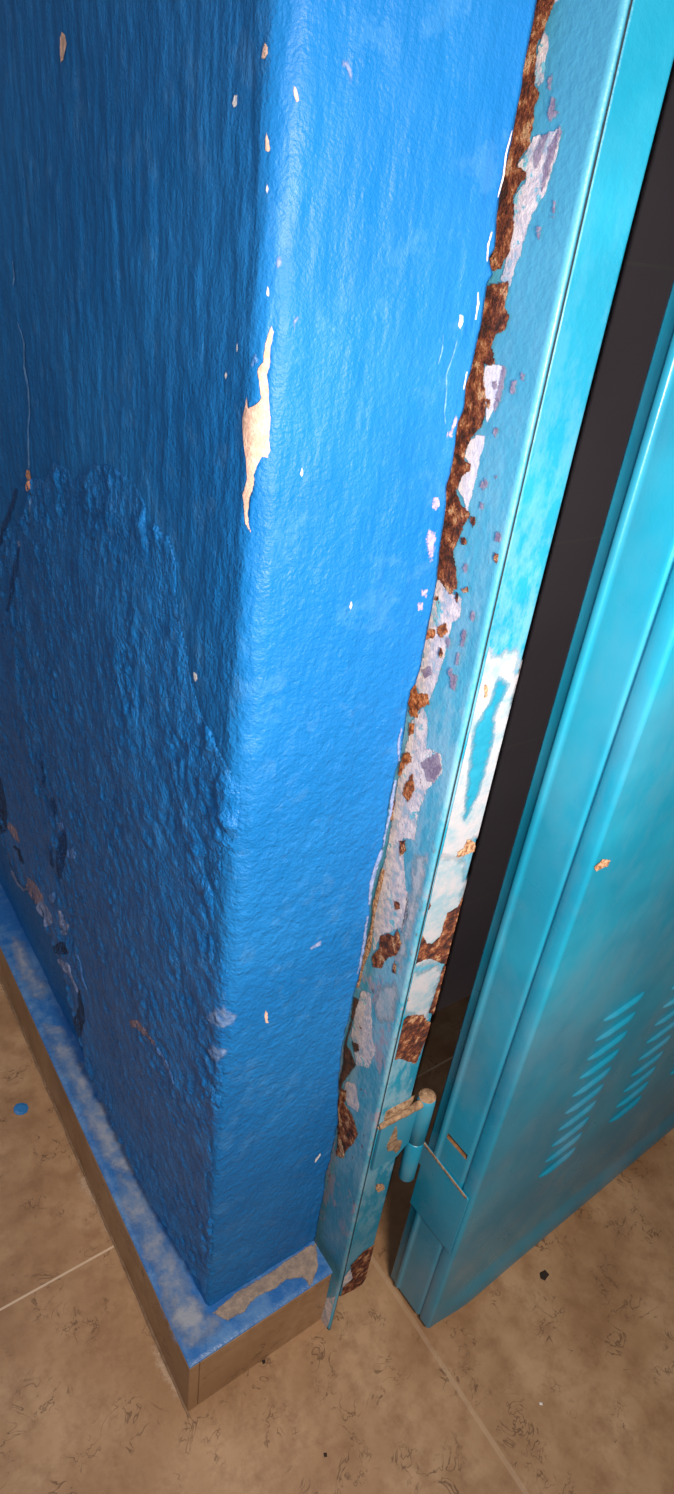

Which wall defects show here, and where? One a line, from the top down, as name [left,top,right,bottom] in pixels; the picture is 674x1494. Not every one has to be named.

peeling [487,33,562,287]
rust [435,0,555,601]
peeling [236,327,274,532]
peeling [427,531,436,557]
rust [426,624,448,640]
peeling [458,364,525,528]
rust [390,684,429,820]
peeling [344,580,520,1112]
rust [336,868,402,1158]
rust [395,897,463,1064]
peeling [46,1020,318,1340]
rust [341,1245,374,1296]